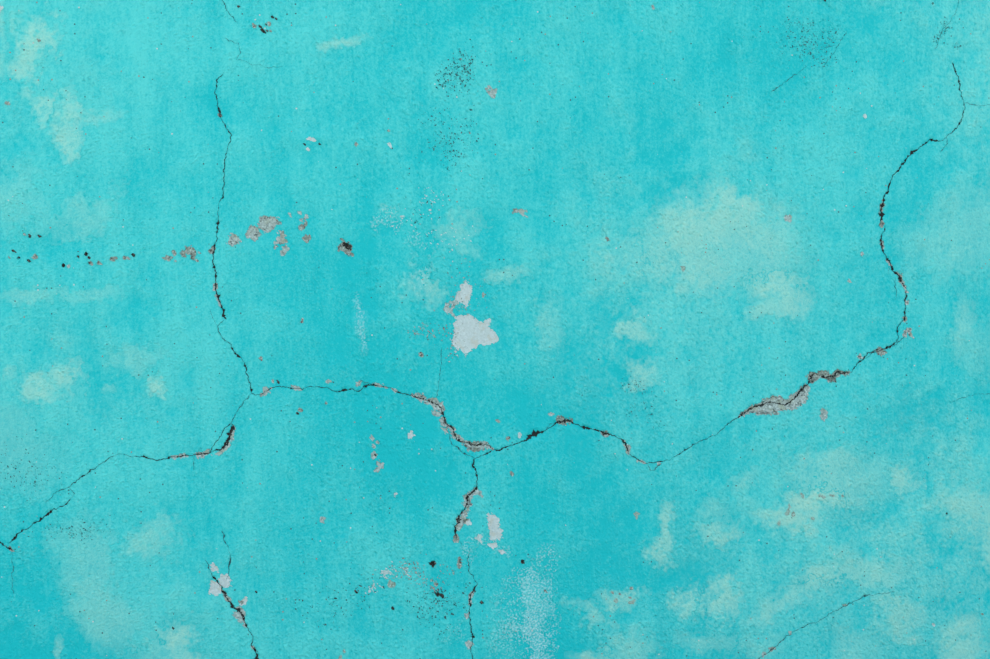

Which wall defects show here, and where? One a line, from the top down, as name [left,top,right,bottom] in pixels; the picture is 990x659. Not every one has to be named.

flaking render [226,211,311,256]
peeling [443,280,499,357]
crack [129,63,989,659]
crack [0,454,117,592]